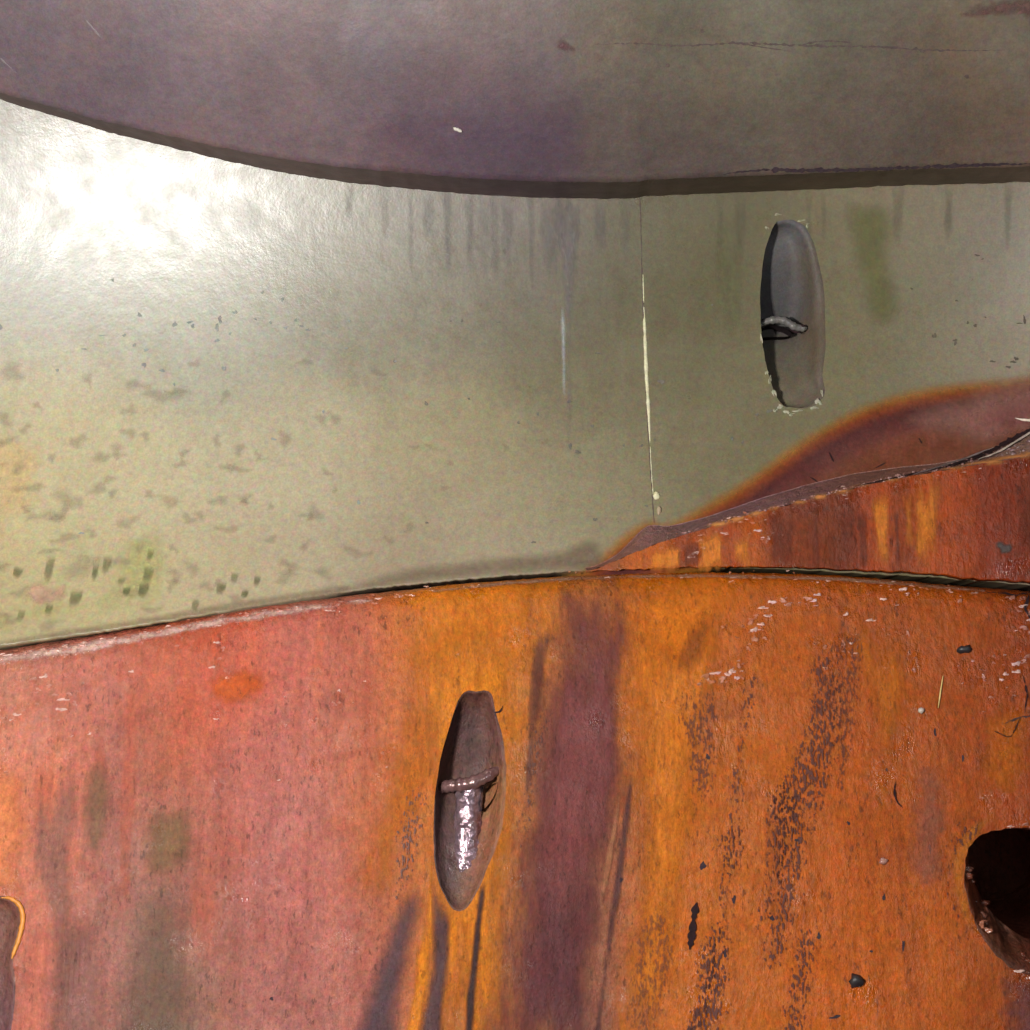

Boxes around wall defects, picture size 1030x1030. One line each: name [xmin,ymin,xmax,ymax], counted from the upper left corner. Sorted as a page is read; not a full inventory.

spalling [765,371,823,417]
corrosion [577,380,1030,576]
damp [0,589,340,661]
corrosion [0,777,26,959]
corrosion [380,635,512,876]
corrosion [408,817,504,1030]
corrosion [633,588,728,1010]
corrosion [955,826,990,925]